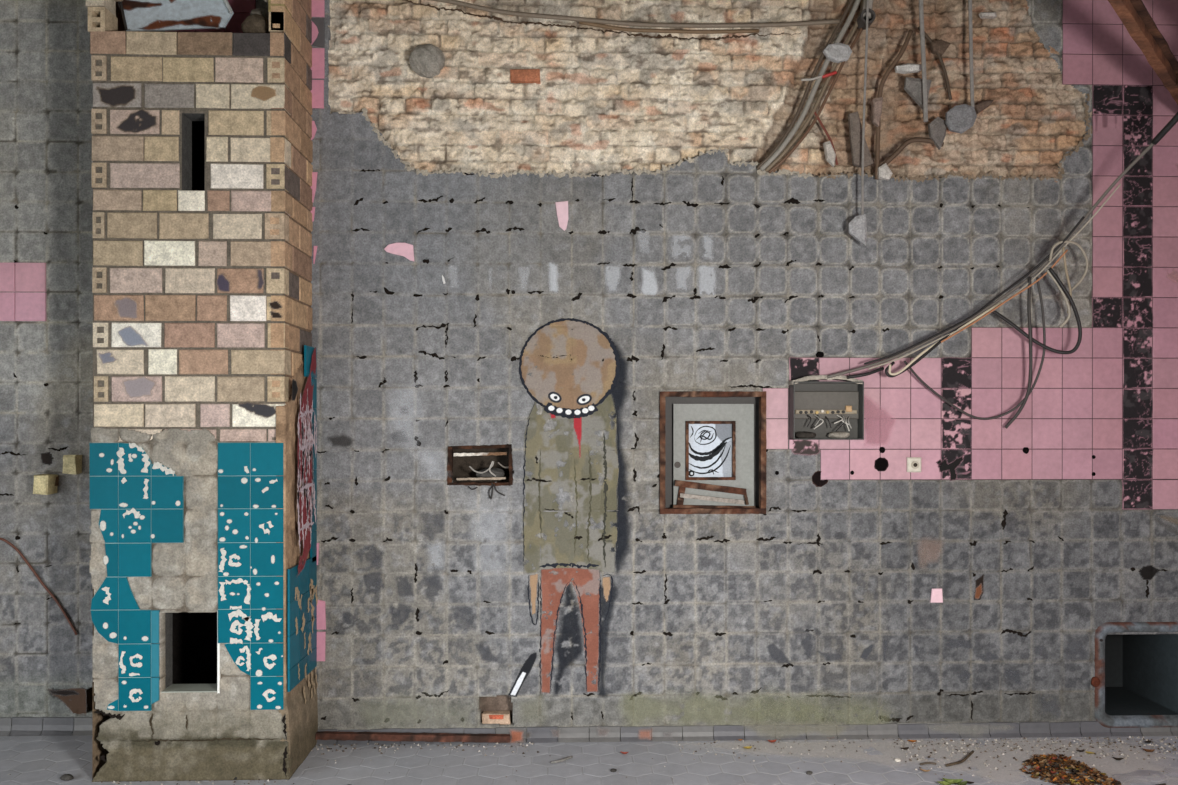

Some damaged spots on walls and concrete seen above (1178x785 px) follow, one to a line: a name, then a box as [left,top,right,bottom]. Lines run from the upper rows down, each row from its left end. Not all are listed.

flaking render [328,0,1092,183]
peeling [99,443,175,538]
peeling [219,466,318,709]
spalling [49,688,86,715]
peeling [103,623,148,709]